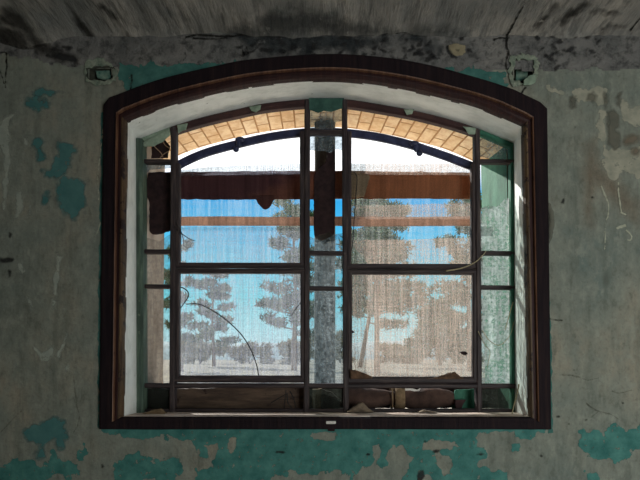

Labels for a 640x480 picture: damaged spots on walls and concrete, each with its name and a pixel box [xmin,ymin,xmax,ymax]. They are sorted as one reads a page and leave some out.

leakage [1,10,42,46]
peeling [84,58,226,91]
leakage [237,33,387,55]
spalling [445,52,540,87]
crack [493,7,523,70]
peeling [40,143,86,219]
peeling [546,85,640,215]
peeling [97,112,560,480]
peeling [0,417,89,480]
peeling [578,423,640,464]